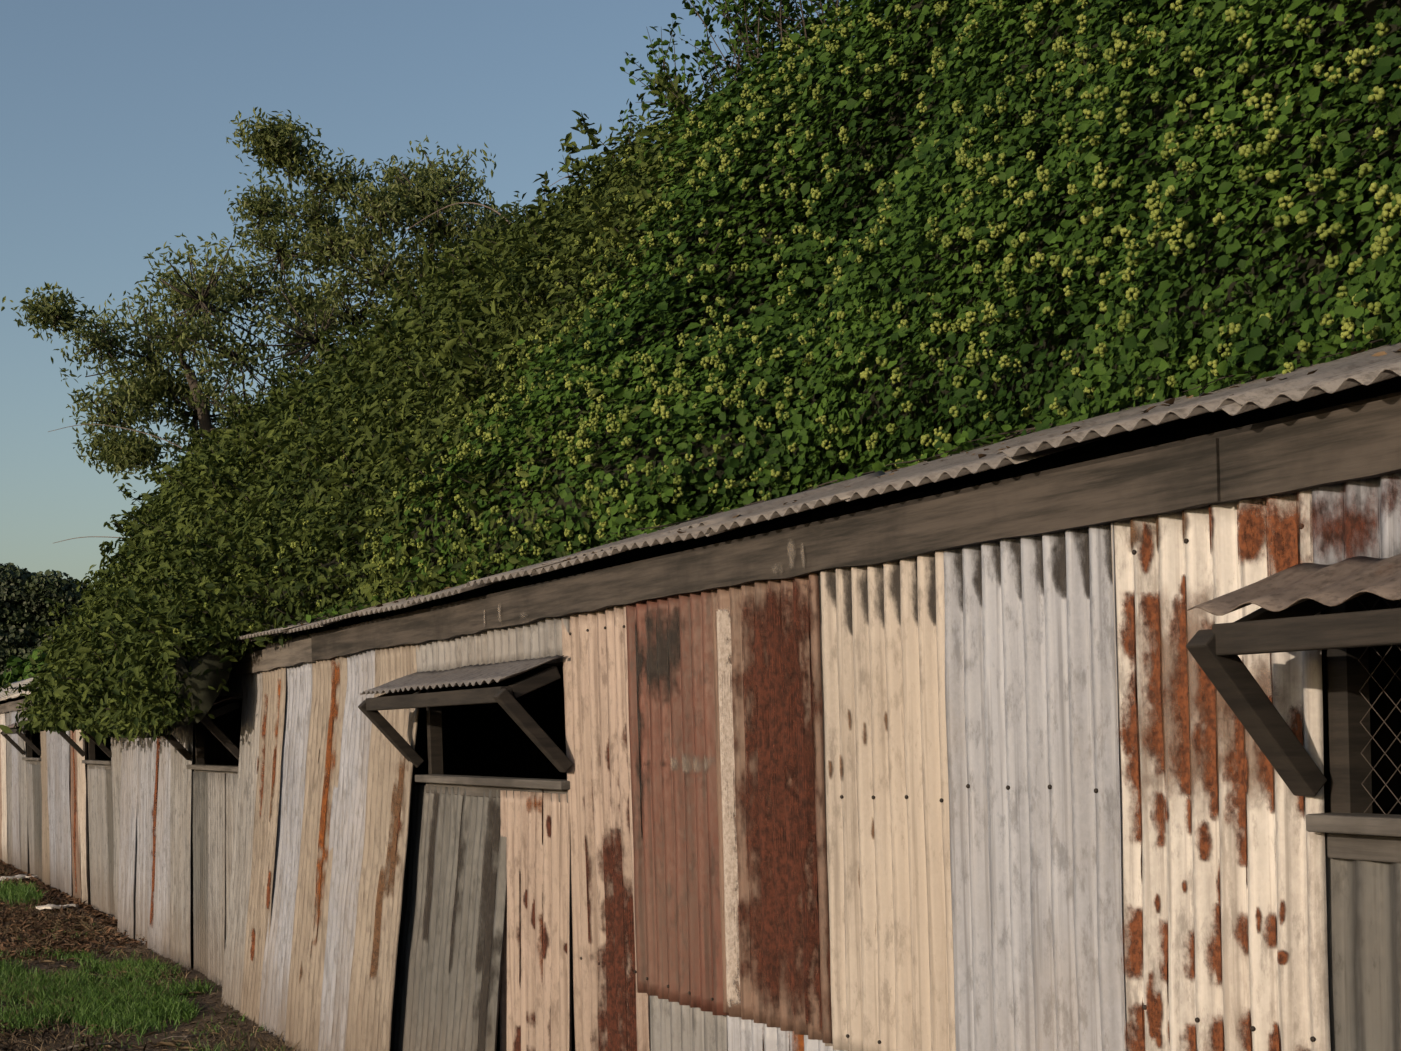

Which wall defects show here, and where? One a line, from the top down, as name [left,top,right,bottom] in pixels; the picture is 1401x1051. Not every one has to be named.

corrosion [1130,519,1159,573]
corrosion [1237,485,1398,577]
corrosion [1288,707,1303,745]
corrosion [299,662,340,982]
corrosion [526,789,551,845]
corrosion [730,580,842,1051]
corrosion [1119,574,1288,1051]
corrosion [262,866,271,909]
corrosion [517,871,567,988]
corrosion [585,726,637,1051]
corrosion [513,1005,551,1051]